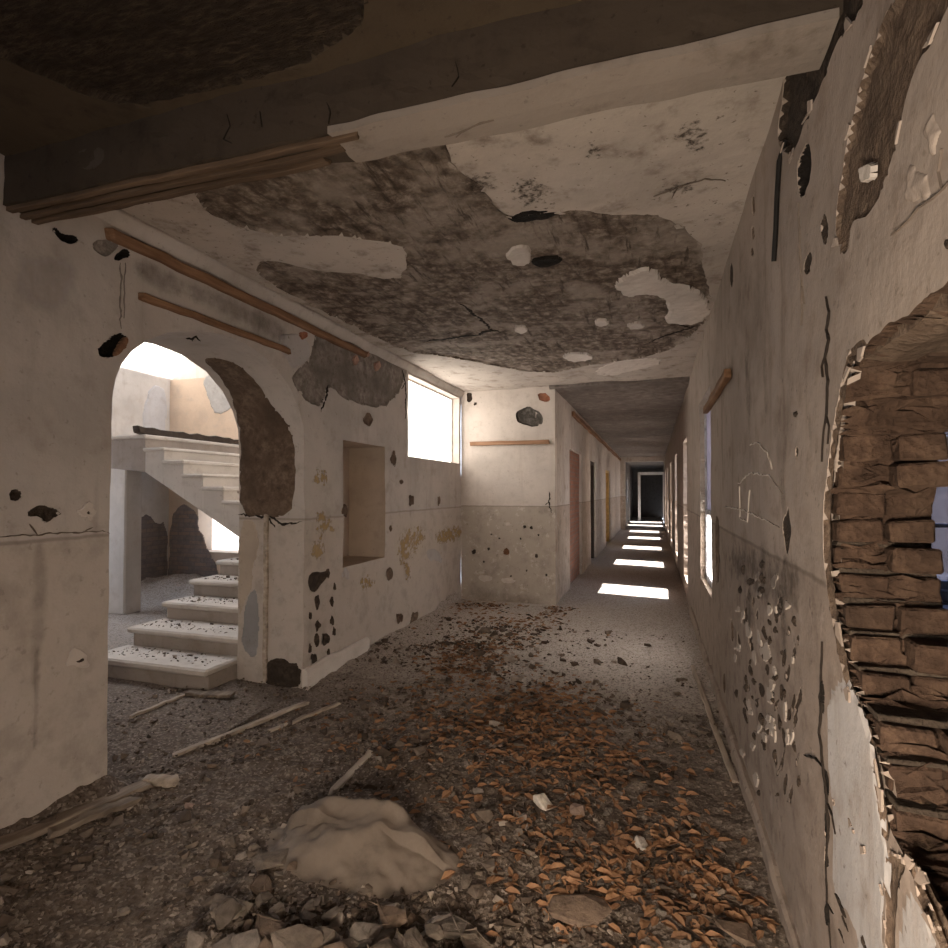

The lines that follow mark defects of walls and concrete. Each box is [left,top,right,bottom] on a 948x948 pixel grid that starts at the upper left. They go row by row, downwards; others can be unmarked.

flaking render [195,145,711,373]
flaking render [778,0,863,196]
flaking render [821,0,948,254]
crack [890,149,948,236]
crack [820,296,830,462]
flaking render [141,504,219,581]
flaking render [205,358,296,657]
flaking render [265,658,301,688]
flaking render [308,569,336,664]
flaking render [723,560,802,803]
crack [803,642,836,948]
spalling [823,334,948,948]